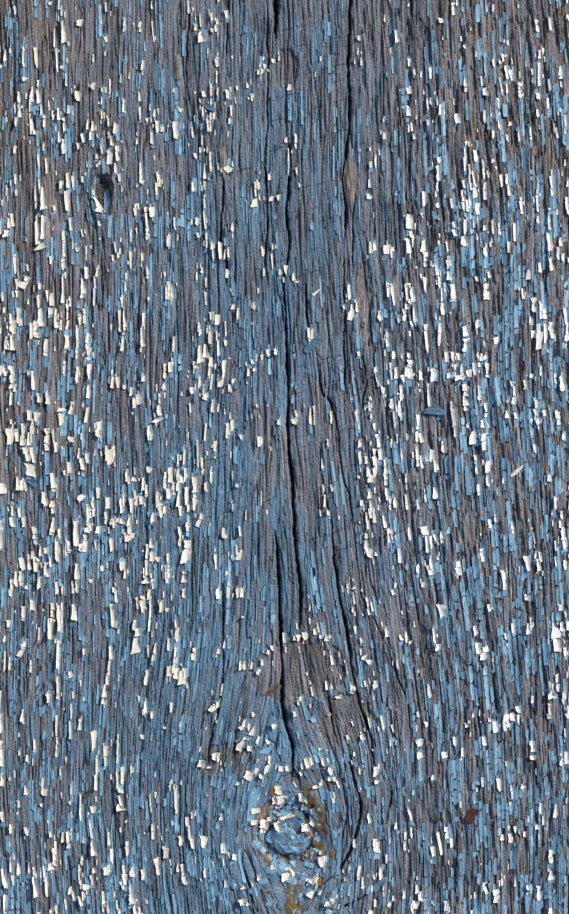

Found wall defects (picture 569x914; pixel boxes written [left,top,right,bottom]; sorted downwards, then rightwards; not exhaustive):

peeling [138,0,280,278]
peeling [477,39,567,143]
peeling [0,0,244,914]
crack [264,0,309,787]
peeling [239,577,378,703]
peeling [224,712,455,914]
crack [317,0,405,814]
peeling [406,526,444,587]
peeling [351,141,569,576]
peeling [465,706,523,746]
peeling [470,850,554,903]
peeling [547,603,569,656]